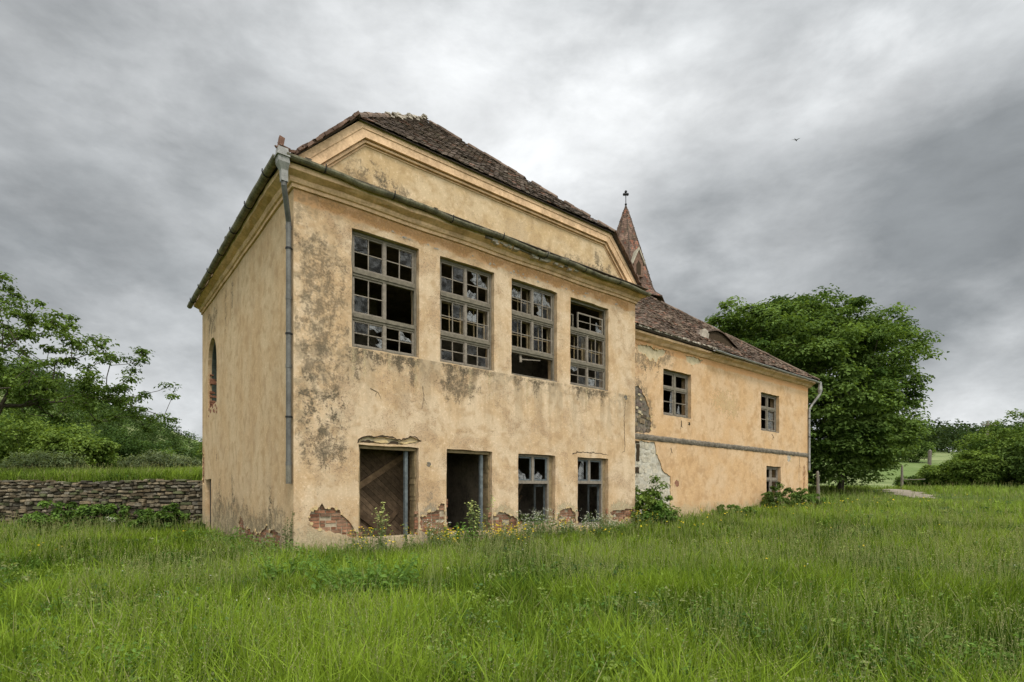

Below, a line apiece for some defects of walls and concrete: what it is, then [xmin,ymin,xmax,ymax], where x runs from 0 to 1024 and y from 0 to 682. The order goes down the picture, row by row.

spalling [208,374,217,417]
water stain [303,429,347,469]
spalling [624,385,680,510]
spalling [303,504,362,553]
spalling [414,499,452,545]
spalling [488,505,522,539]
spalling [606,501,643,527]